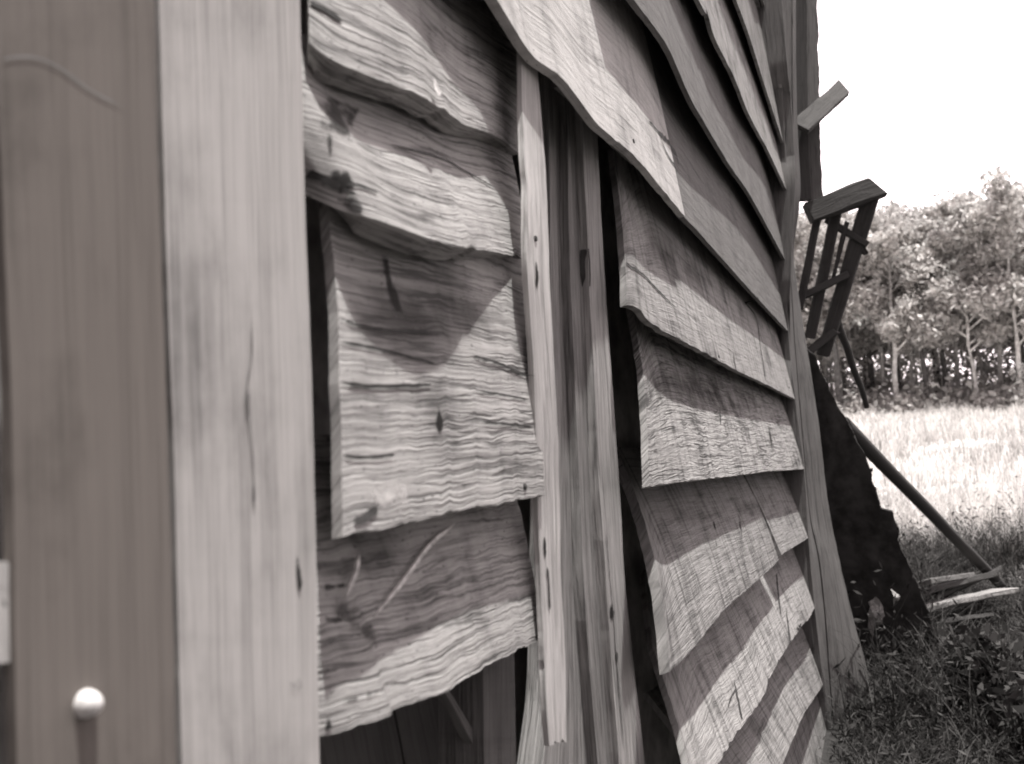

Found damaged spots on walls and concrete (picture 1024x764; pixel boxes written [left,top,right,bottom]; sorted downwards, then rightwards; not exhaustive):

crack [246,331,255,500]